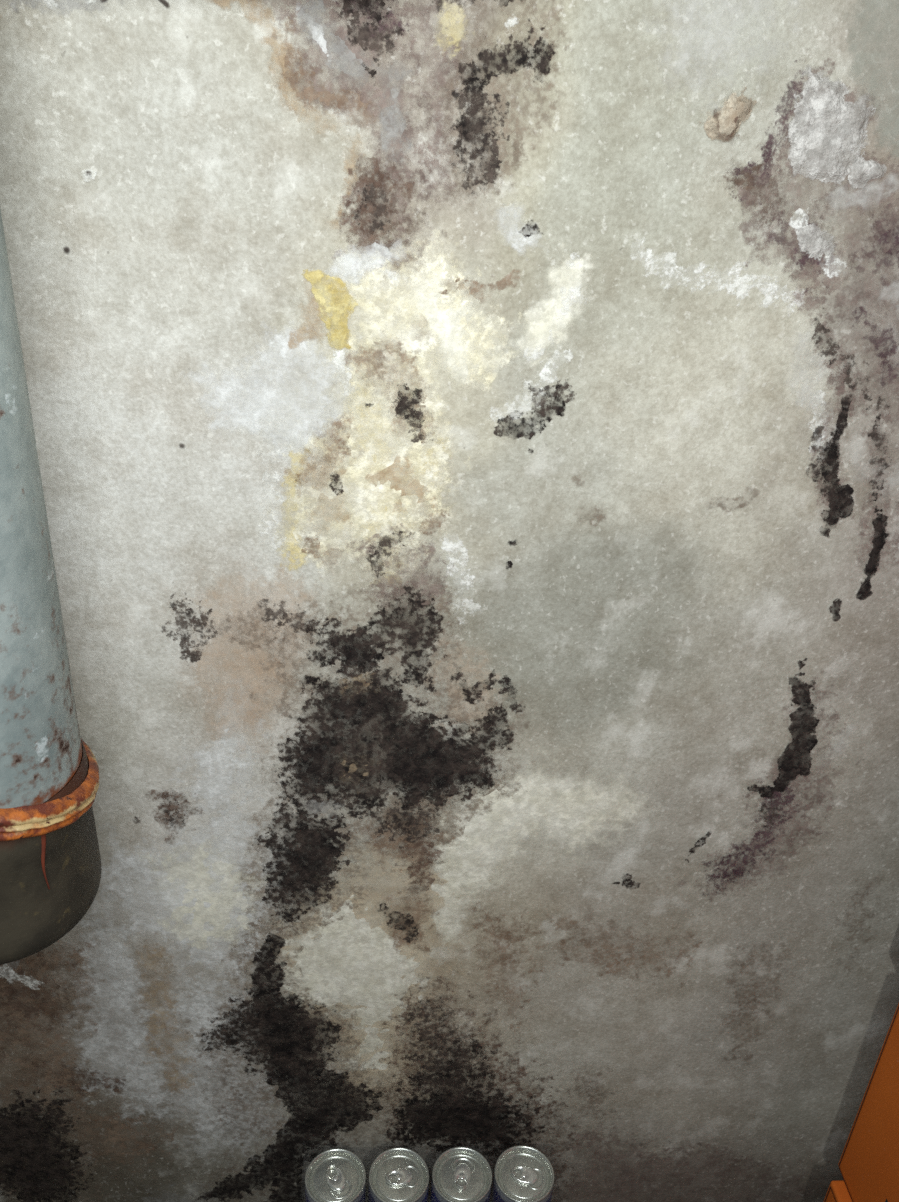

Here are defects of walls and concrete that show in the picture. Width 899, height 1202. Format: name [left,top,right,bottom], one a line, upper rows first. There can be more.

damp [632,59,899,600]
damp [0,0,702,1202]
damp [687,658,839,896]
damp [829,599,842,621]